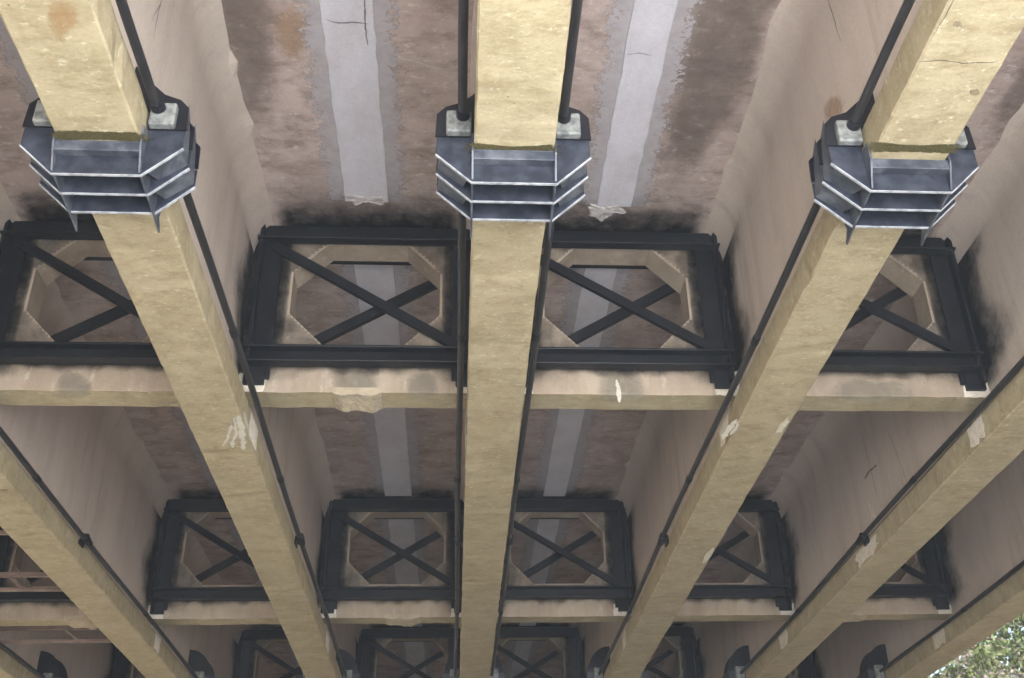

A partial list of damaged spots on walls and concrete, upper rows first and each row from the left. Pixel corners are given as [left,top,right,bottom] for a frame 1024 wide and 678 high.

crack [328,0,368,45]